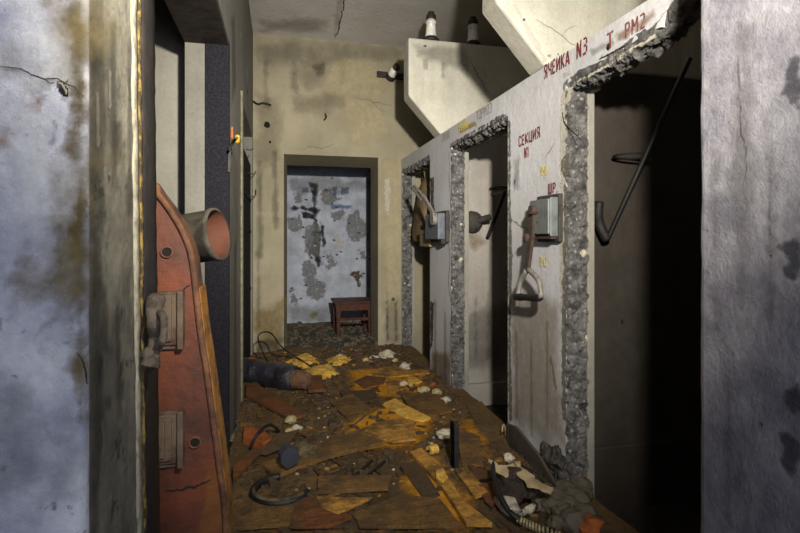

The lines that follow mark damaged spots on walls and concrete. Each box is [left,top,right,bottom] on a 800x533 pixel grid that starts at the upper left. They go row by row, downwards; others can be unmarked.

crack [0,66,84,97]
water stain [38,2,98,80]
water stain [14,76,87,311]
peeling [287,177,371,306]
spalling [392,155,435,348]
spalling [450,114,513,422]
spalling [539,0,701,494]